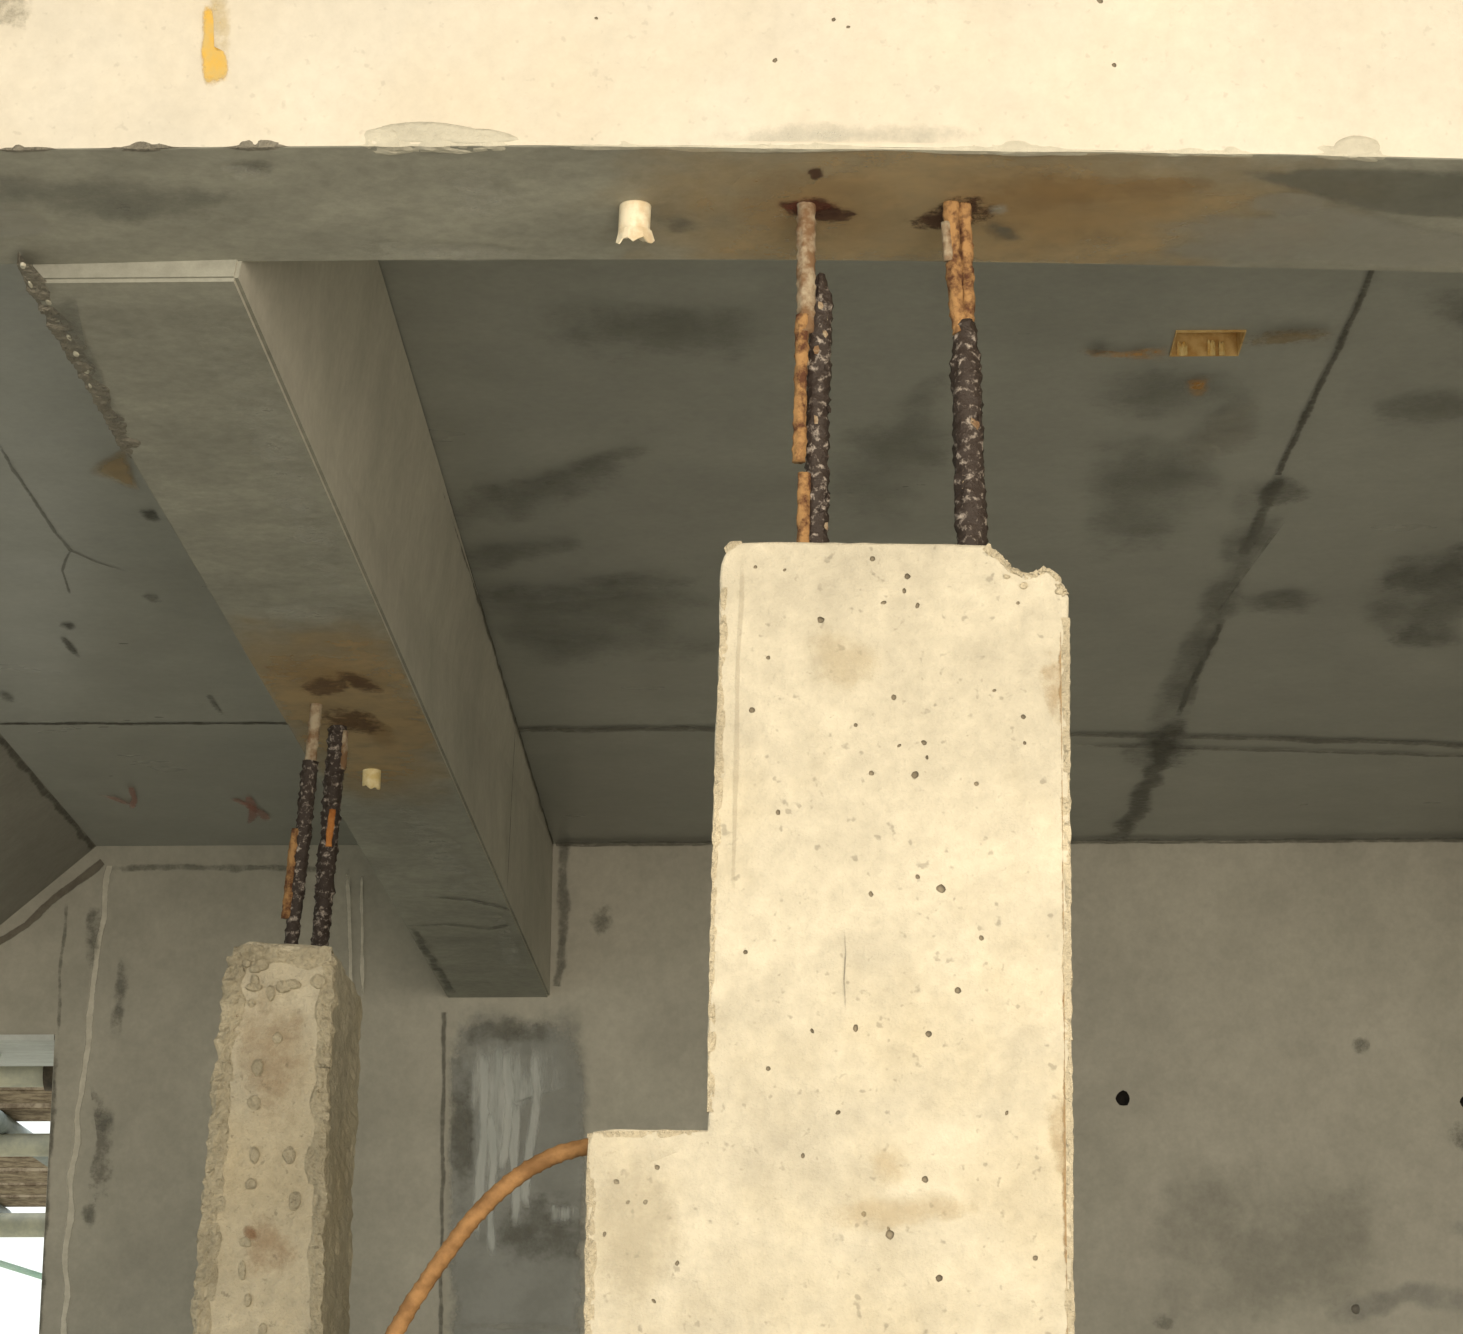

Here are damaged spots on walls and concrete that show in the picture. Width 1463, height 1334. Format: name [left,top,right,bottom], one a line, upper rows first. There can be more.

rust [721,151,1255,264]
spalling [17,252,141,458]
rust [807,301,829,371]
crack [1240,270,1374,554]
rust [263,640,434,783]
crack [1070,625,1463,833]
crack [0,722,365,1334]
water stain [450,1022,585,1334]